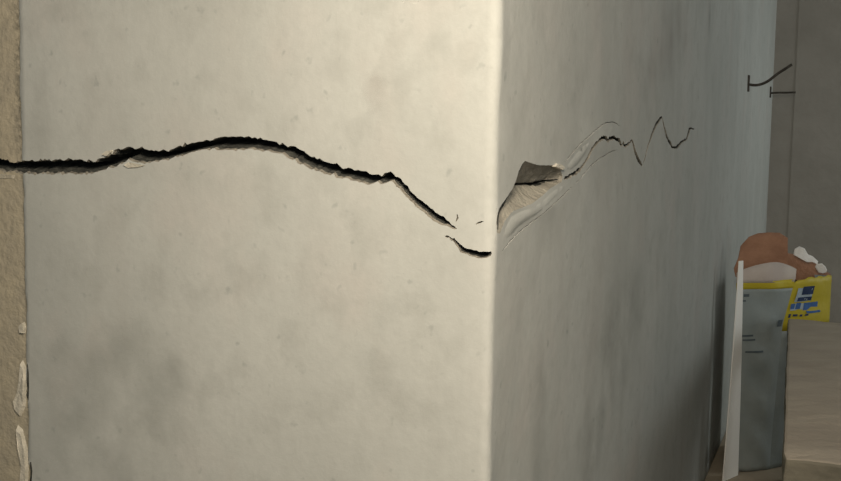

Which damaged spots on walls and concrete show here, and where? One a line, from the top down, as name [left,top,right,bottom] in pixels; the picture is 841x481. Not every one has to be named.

crack [0,116,694,258]
spalling [496,161,565,233]